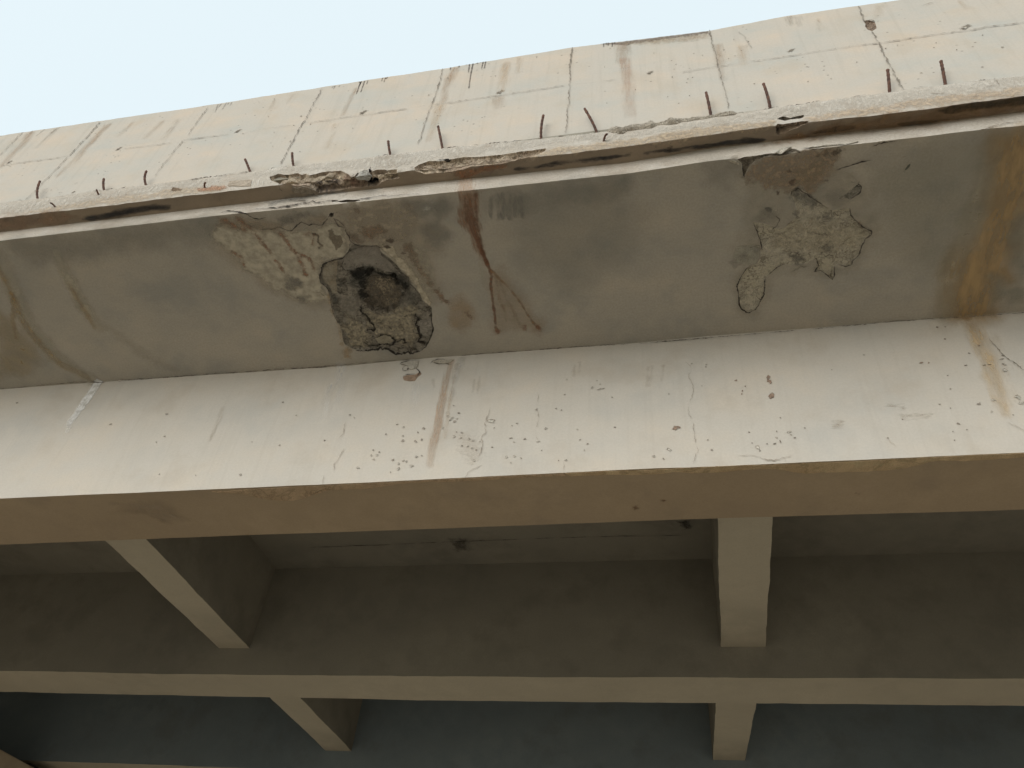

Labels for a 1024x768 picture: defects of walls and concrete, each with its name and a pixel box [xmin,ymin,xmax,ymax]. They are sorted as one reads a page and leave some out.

water stain [84,206,170,221]
peeling [213,205,446,381]
rust [457,166,506,178]
rust [459,193,539,332]
spalling [270,60,1024,194]